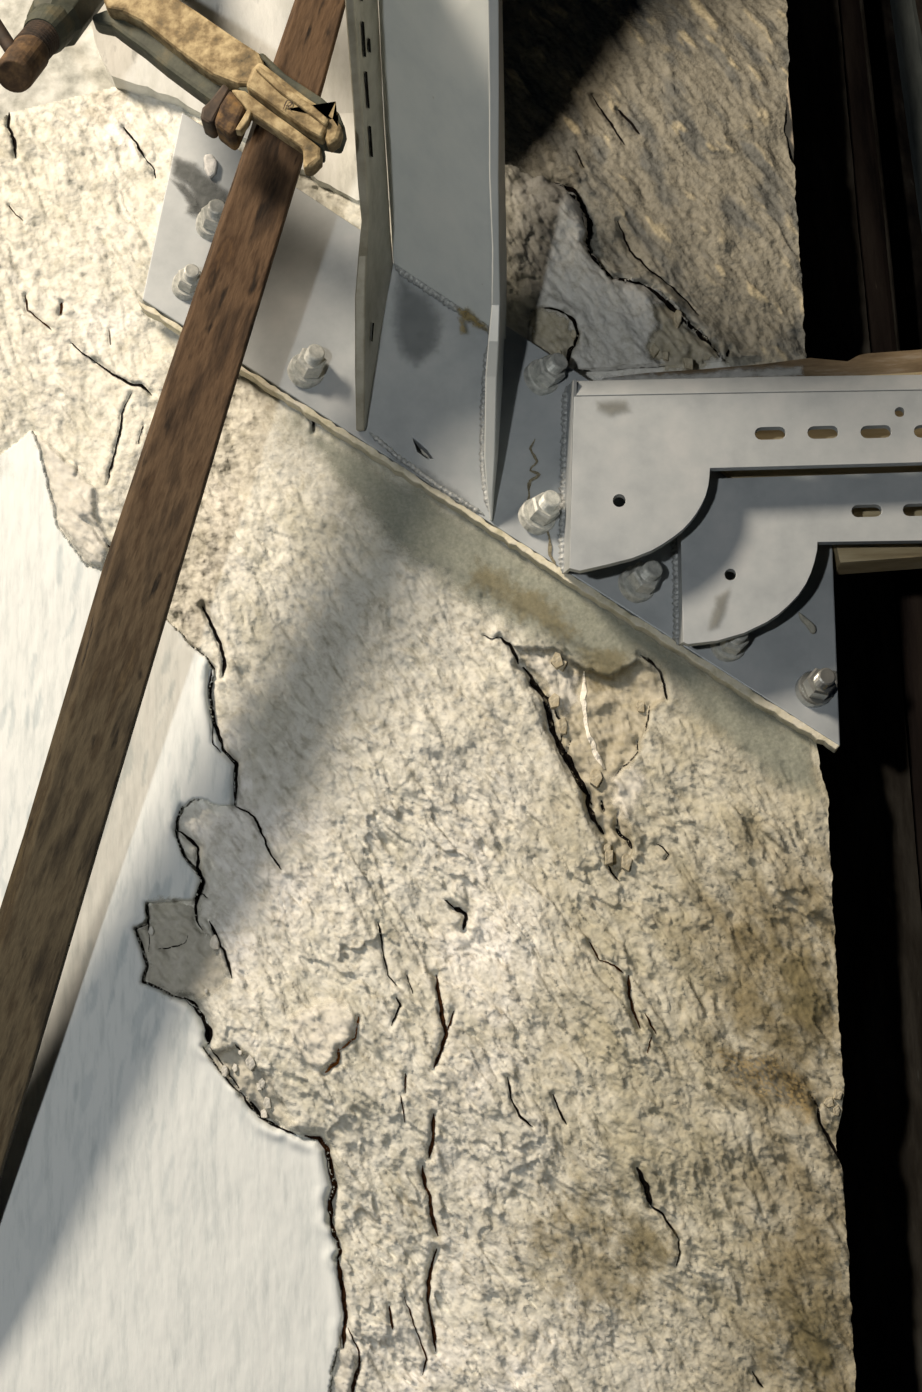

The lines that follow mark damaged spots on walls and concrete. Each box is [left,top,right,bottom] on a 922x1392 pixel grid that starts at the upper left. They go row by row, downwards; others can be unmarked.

spalling [784,77,794,164]
crack [25,296,151,485]
leakage [317,439,812,785]
spalling [520,649,665,875]
spalling [138,899,227,998]
peeling [289,1001,357,1065]
crack [444,899,468,930]
crack [589,941,656,1053]
spalling [211,1047,291,1125]
crack [507,1077,566,1127]
spalling [812,1086,843,1128]
crack [636,1167,681,1266]